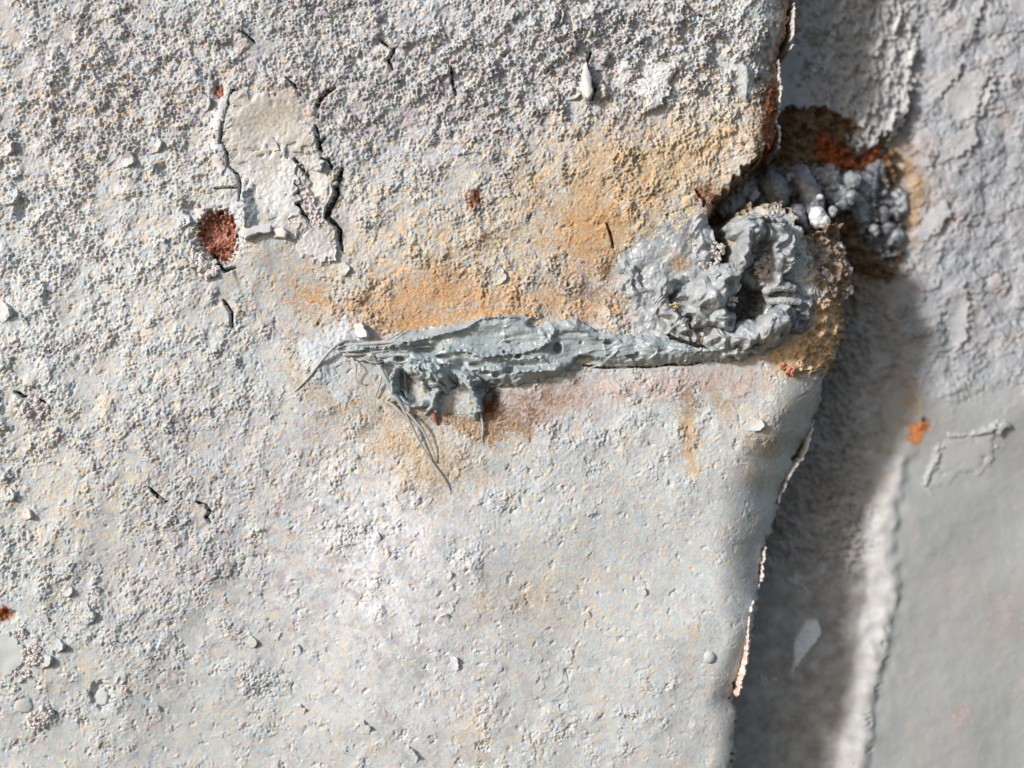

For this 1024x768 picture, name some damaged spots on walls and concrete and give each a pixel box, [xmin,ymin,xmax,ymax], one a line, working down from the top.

corrosion [812,129,881,172]
peeling [199,87,351,277]
corrosion [197,209,239,264]
corrosion [276,82,844,519]
corrosion [907,419,930,444]